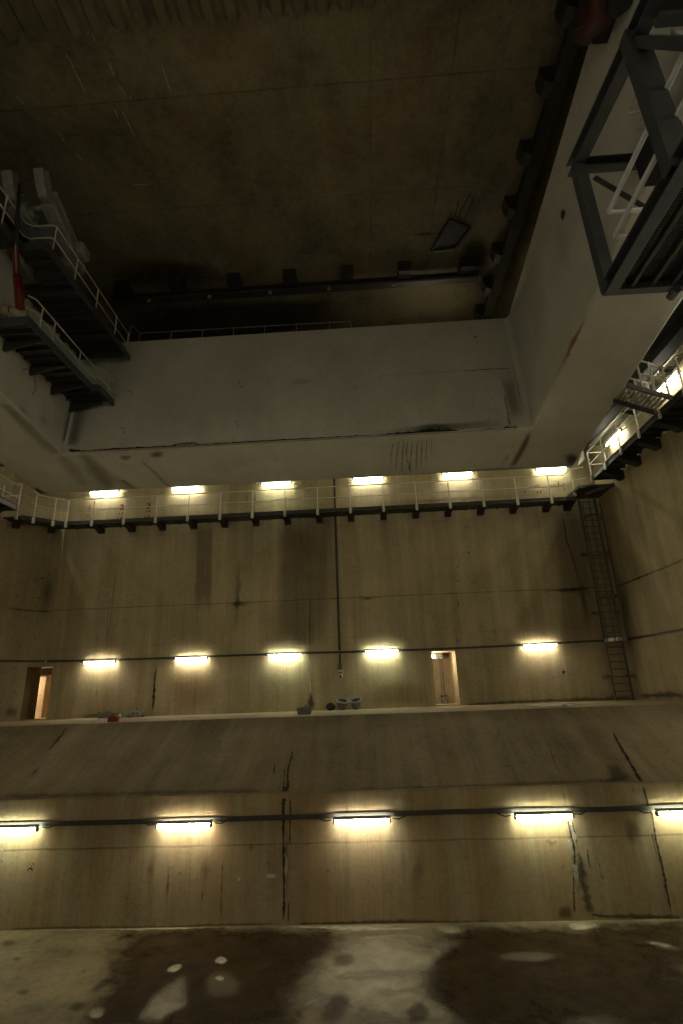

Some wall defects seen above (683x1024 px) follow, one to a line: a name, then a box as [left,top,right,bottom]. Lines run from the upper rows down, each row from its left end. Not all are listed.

crack [69,429,460,452]
crack [150,666,158,709]
crack [273,752,293,921]
crack [613,734,671,909]
water stain [29,914,683,1024]